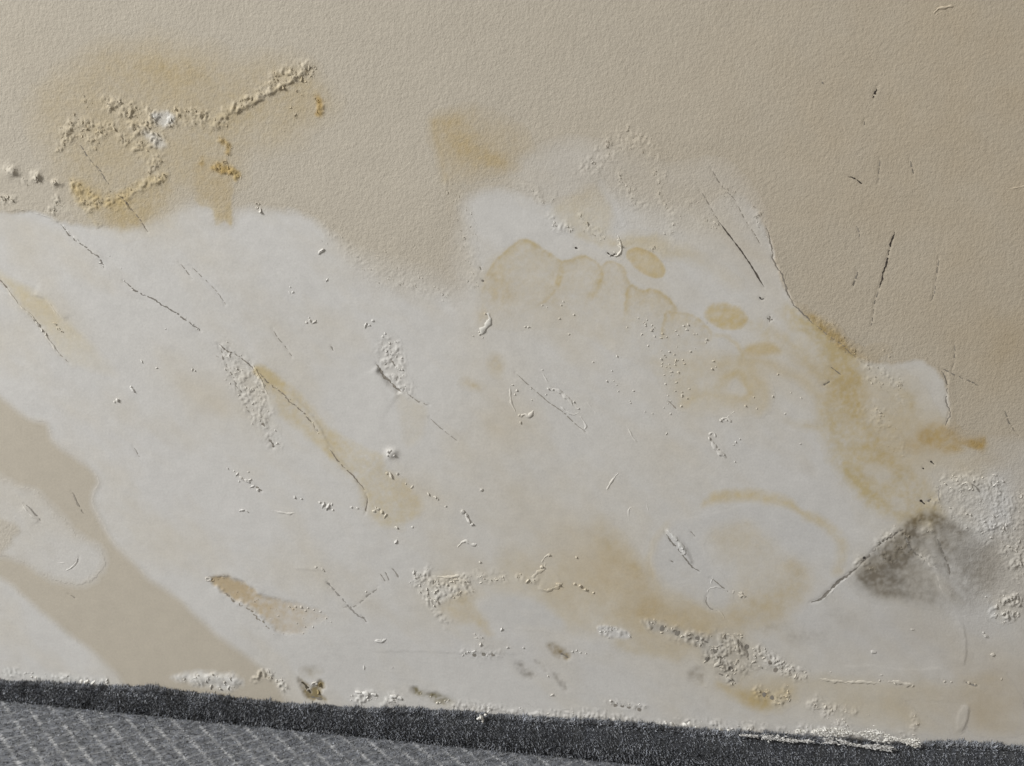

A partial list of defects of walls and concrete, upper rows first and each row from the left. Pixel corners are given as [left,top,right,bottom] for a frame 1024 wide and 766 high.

flaking render [464,133,793,352]
crack [10,209,367,511]
damp [259,362,430,534]
flaking render [0,202,1024,747]
damp [442,513,818,681]
damp [472,237,1004,616]
crack [812,529,903,602]